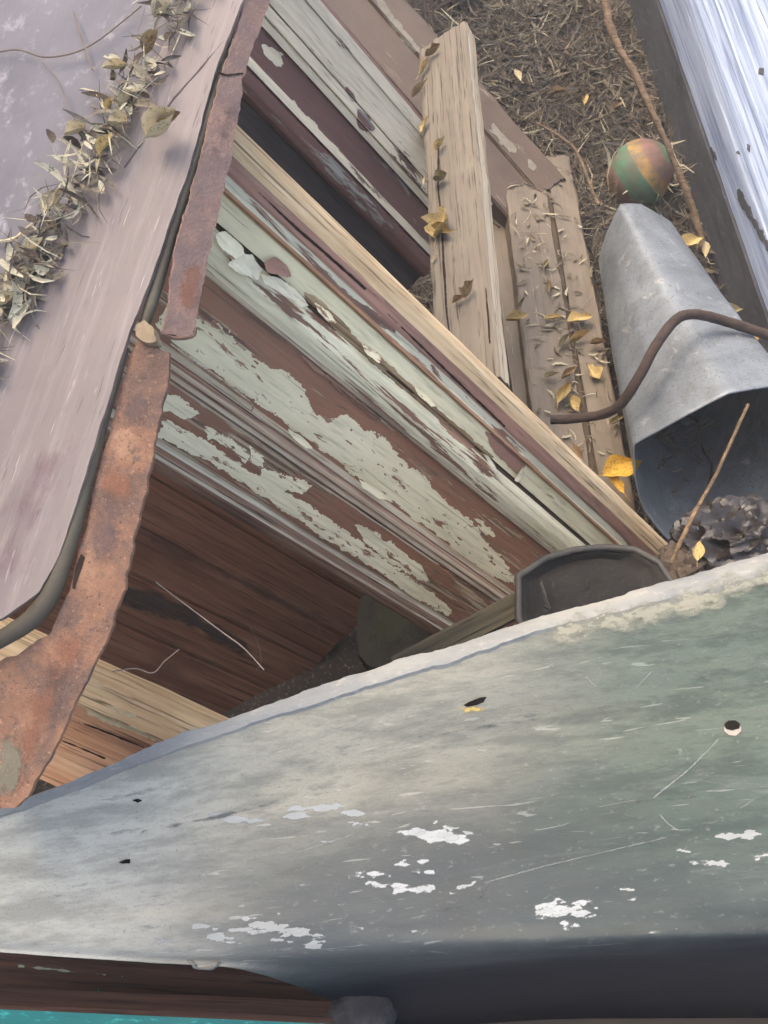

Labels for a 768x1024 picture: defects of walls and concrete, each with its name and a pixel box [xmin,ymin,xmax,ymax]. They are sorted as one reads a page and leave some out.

peeling [376,0,420,53]
peeling [261,44,283,67]
peeling [345,87,375,132]
peeling [489,123,517,153]
peeling [216,231,291,280]
peeling [155,292,525,616]